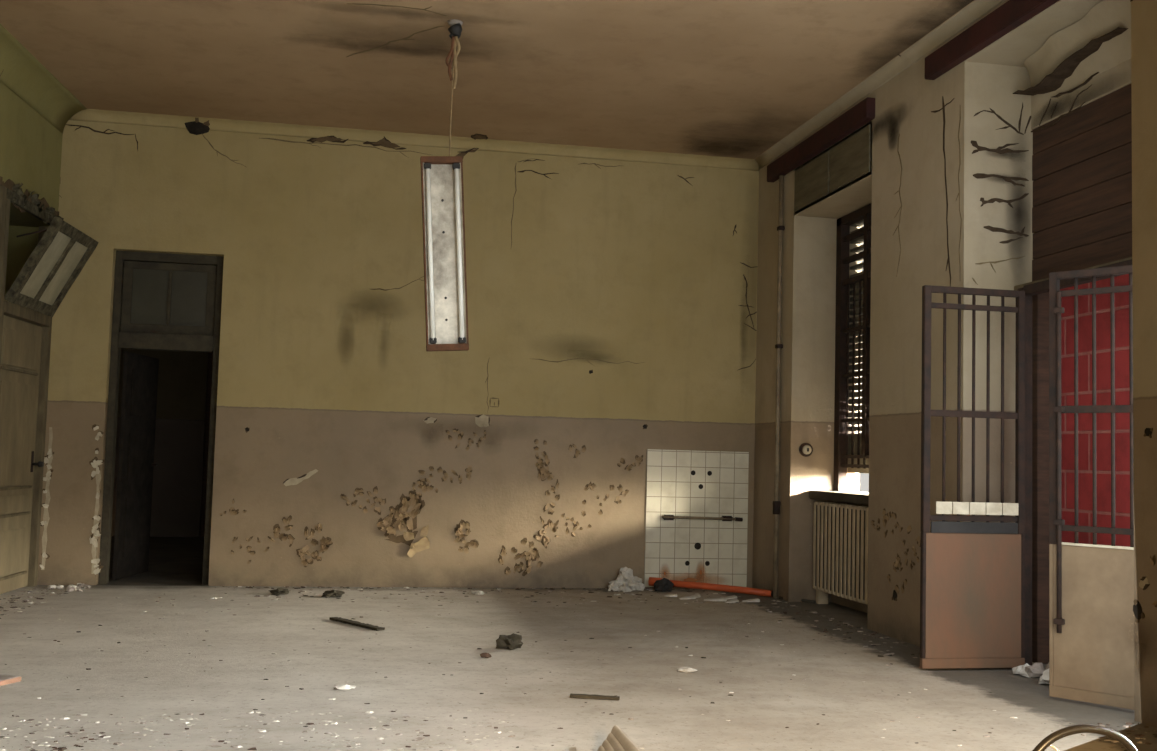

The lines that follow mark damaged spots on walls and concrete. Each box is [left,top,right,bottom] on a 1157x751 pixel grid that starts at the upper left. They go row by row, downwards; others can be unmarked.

crack [66,124,138,150]
flaking render [363,136,406,150]
flaking render [456,134,488,158]
crack [931,85,1091,287]
peeling [39,427,54,570]
peeling [89,424,104,575]
peeling [340,465,472,557]
peeling [454,519,479,554]
peeling [498,439,629,576]